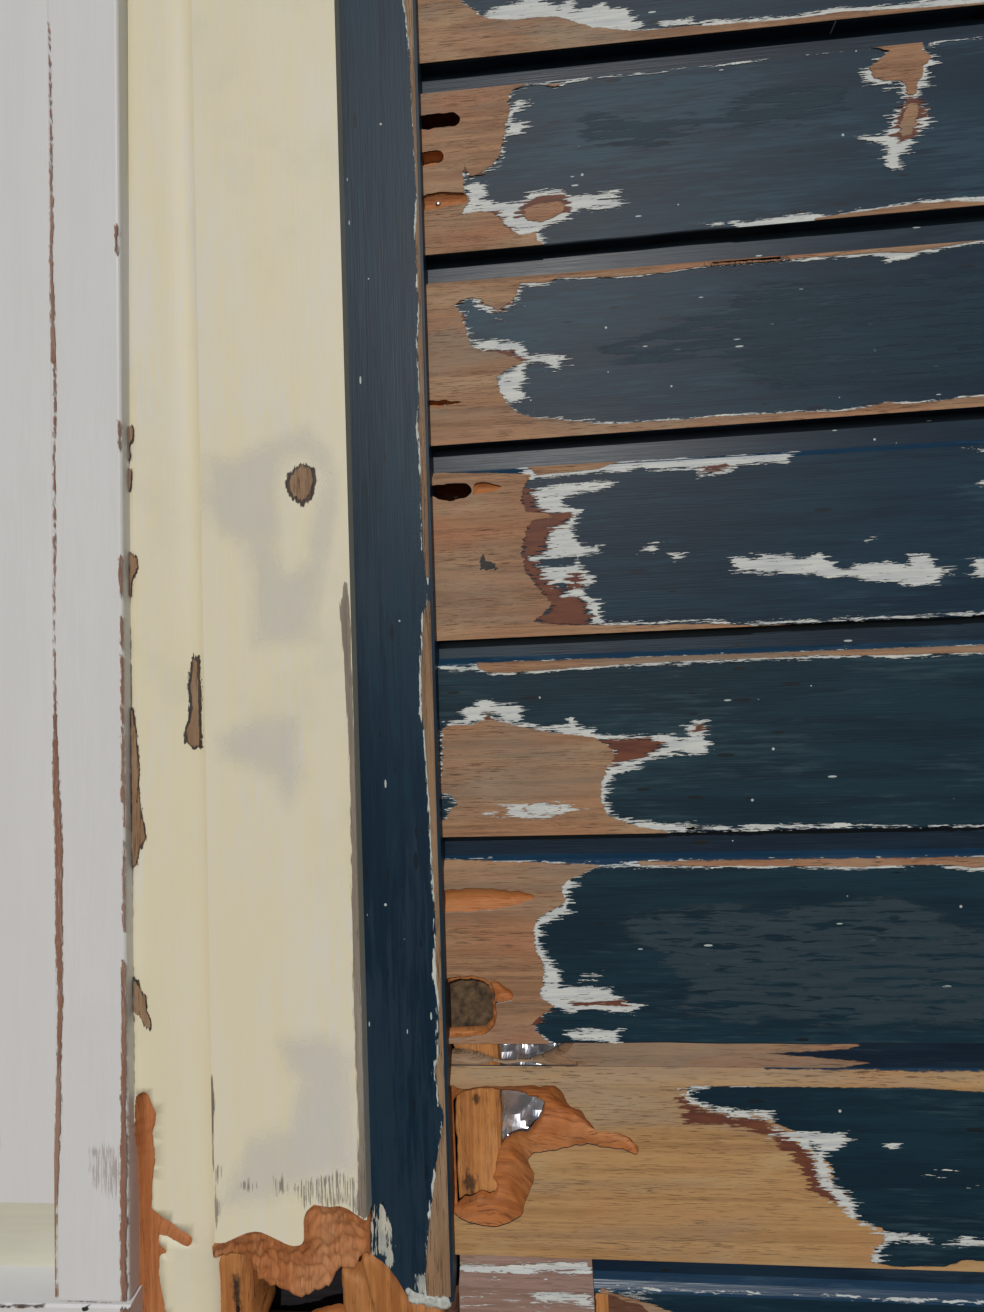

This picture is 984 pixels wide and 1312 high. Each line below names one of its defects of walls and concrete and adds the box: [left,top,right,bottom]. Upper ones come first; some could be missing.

peeling [183,653,203,750]
peeling [402,0,984,1312]
spalling [119,960,192,1312]
spalling [269,1267,344,1311]